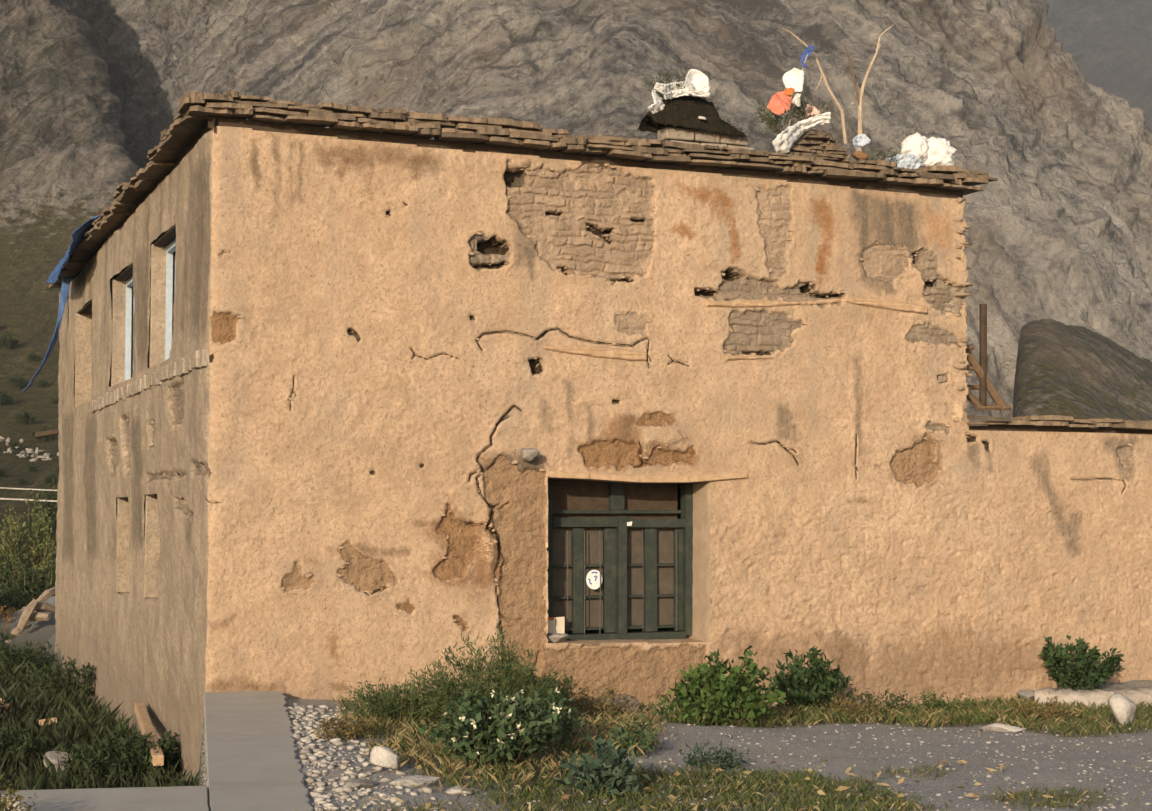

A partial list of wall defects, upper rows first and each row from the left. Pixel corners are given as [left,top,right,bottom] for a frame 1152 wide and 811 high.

spalling [467,232,510,270]
spalling [506,160,657,284]
spalling [697,185,845,356]
flaking render [860,242,966,316]
spalling [210,310,244,344]
crack [411,328,688,368]
spalling [578,439,696,471]
crack [754,440,799,465]
spalling [890,417,950,488]
crack [457,405,522,633]
flaking render [334,540,398,593]
spalling [479,454,709,706]